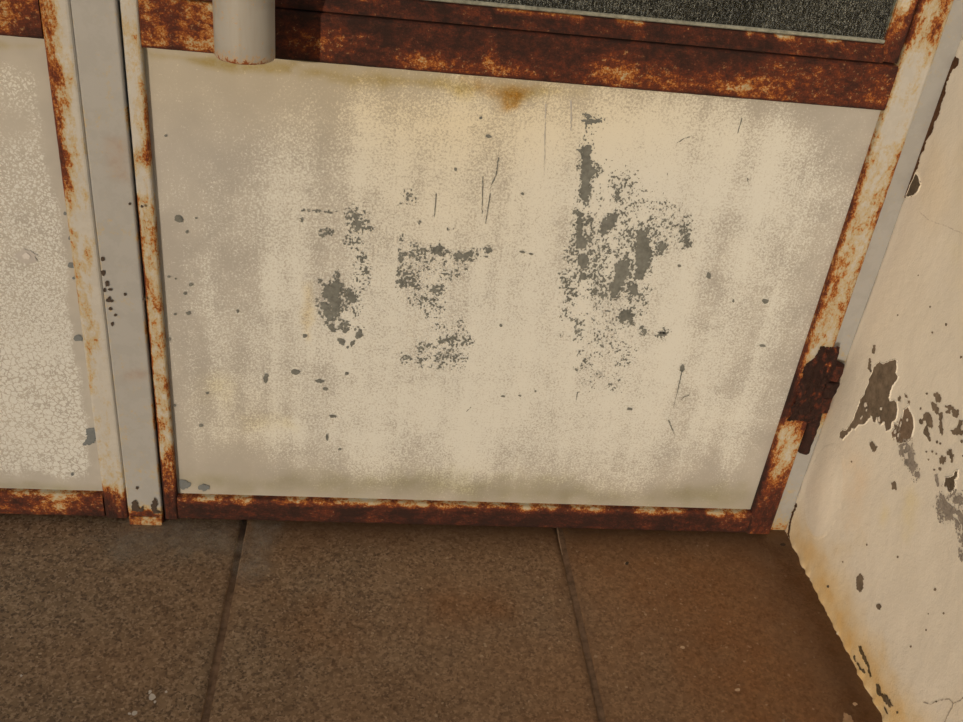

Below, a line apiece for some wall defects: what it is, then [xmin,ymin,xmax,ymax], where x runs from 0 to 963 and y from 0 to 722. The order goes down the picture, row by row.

peeling [291,202,377,349]
peeling [395,234,492,371]
peeling [558,108,696,395]
flaking render [839,345,963,562]